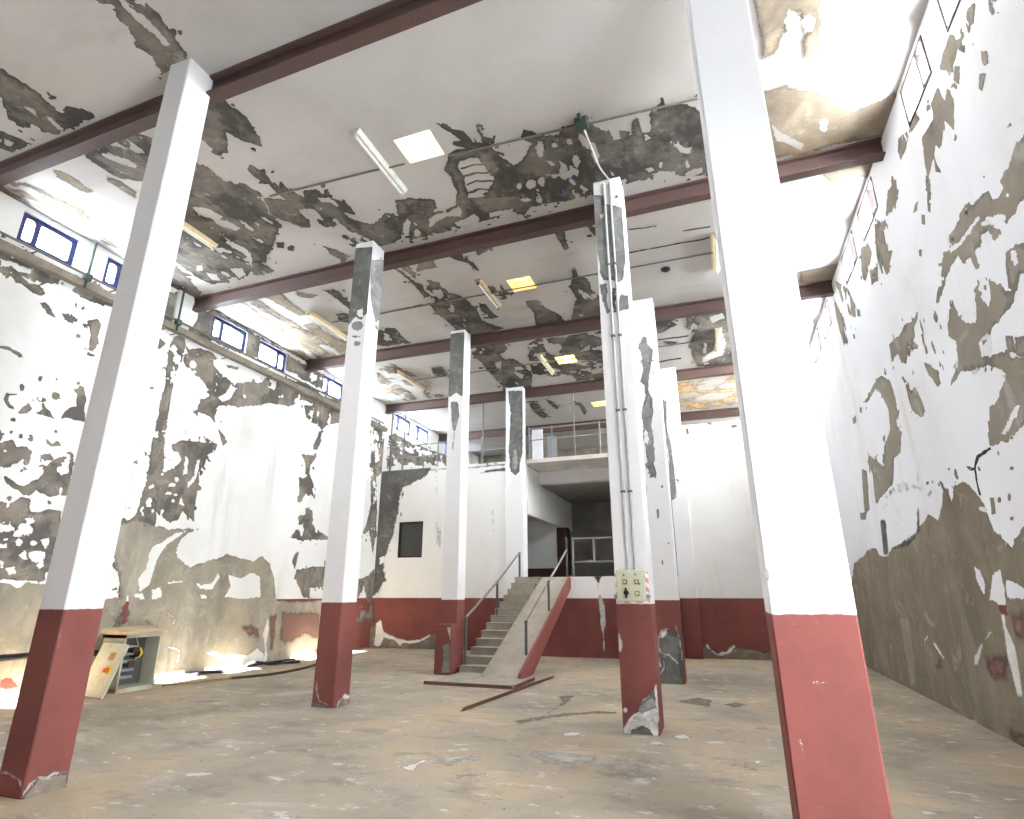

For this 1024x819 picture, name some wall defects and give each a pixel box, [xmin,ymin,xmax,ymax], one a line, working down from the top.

peeling [0,68,95,153]
peeling [898,3,988,225]
peeling [0,246,113,357]
peeling [833,281,860,344]
peeling [853,135,1024,520]
peeling [85,94,708,678]
crack [967,447,991,496]
peeling [0,378,86,701]
peeling [852,466,1024,747]
peeling [624,629,684,736]
peeling [24,773,67,800]